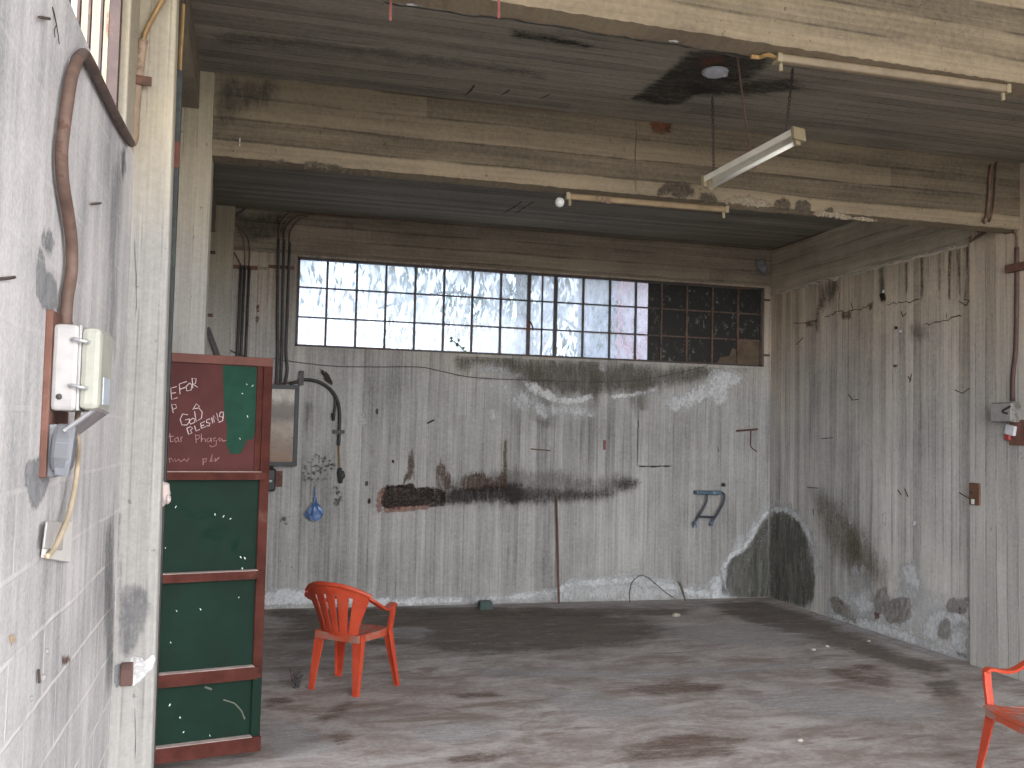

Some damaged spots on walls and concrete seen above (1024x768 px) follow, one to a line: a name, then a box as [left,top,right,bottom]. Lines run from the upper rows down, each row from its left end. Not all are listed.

damp [633,51,797,105]
spalling [657,182,877,222]
damp [42,232,54,253]
damp [459,357,745,418]
damp [436,461,508,492]
damp [265,502,970,719]
spalling [831,597,856,623]
spalling [874,587,912,624]
spalling [937,598,968,640]